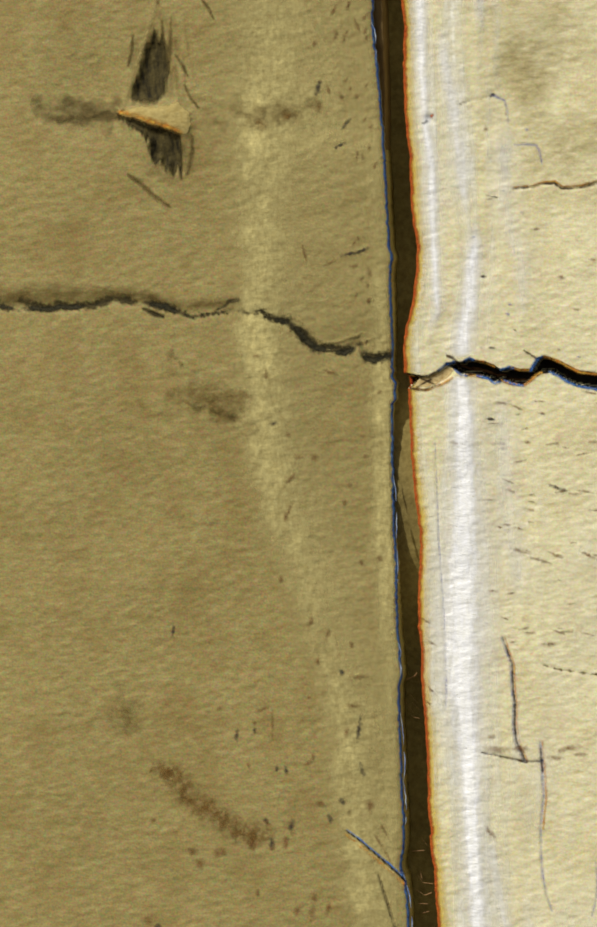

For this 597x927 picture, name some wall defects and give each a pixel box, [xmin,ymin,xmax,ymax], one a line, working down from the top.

spalling [131,30,169,102]
spalling [119,118,182,179]
crack [523,161,592,189]
crack [0,290,392,364]
crack [408,350,597,391]